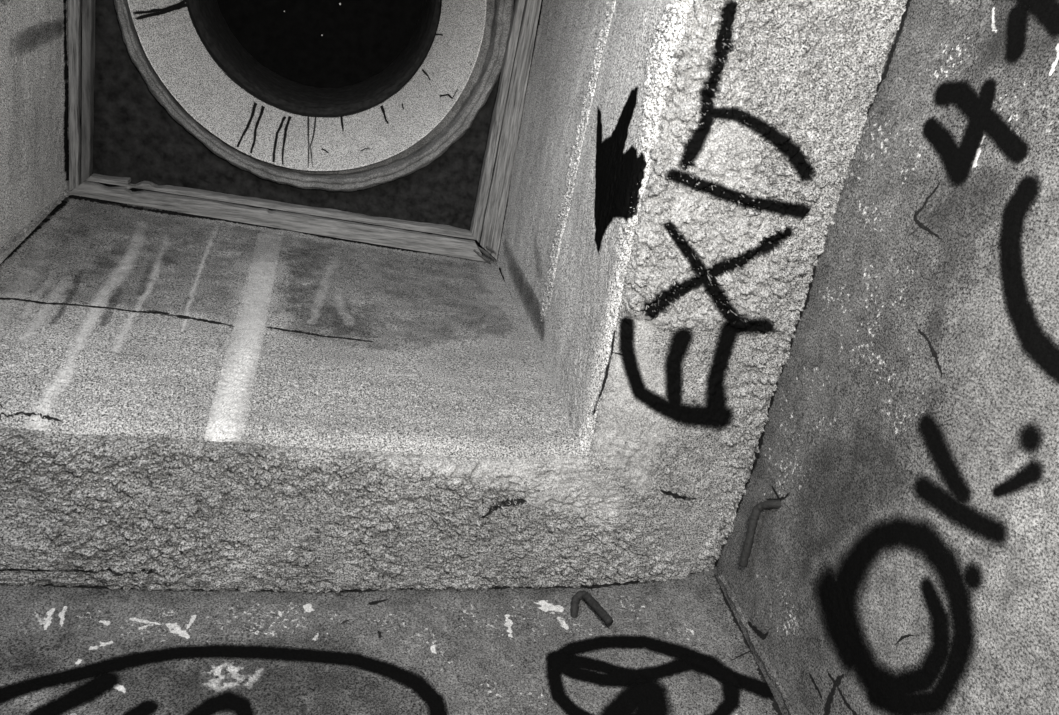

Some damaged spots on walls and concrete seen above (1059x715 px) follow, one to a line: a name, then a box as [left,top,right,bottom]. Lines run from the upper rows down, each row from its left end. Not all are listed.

crack [524,0,543,99]
crack [0,0,470,265]
crack [913,180,943,240]
leakage [29,237,141,430]
crack [0,297,235,327]
leakage [182,242,211,330]
leakage [207,261,274,442]
crack [267,327,374,342]
crack [0,404,61,422]